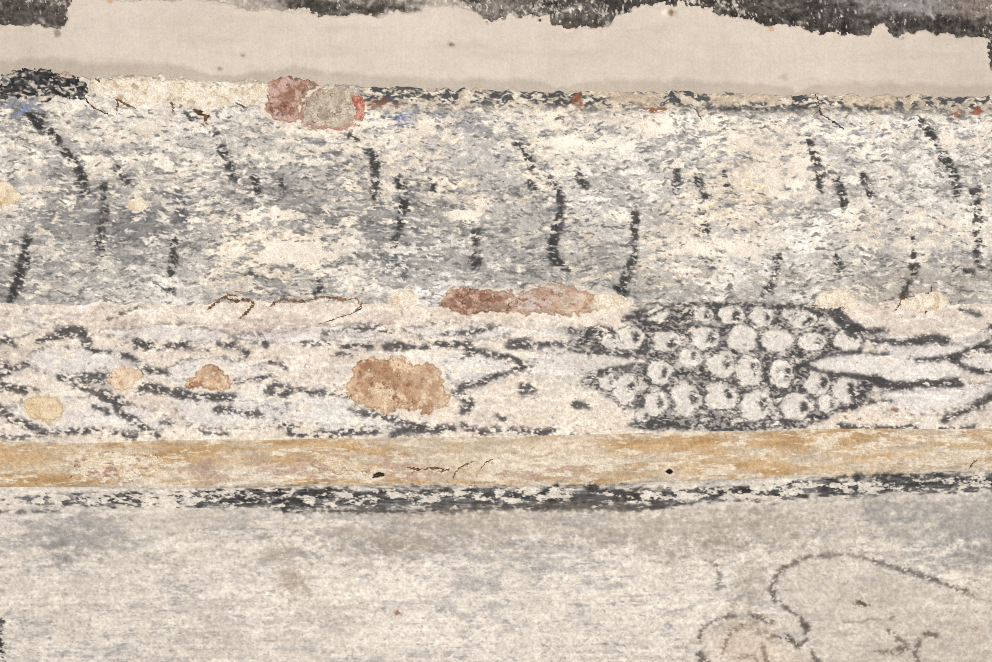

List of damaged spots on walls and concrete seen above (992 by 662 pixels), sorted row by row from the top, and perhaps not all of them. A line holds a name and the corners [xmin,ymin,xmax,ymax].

flaking render [0,68,319,123]
peeling [82,120,178,146]
flaking render [439,283,597,317]
flaking render [184,364,233,392]
flaking render [345,355,452,416]